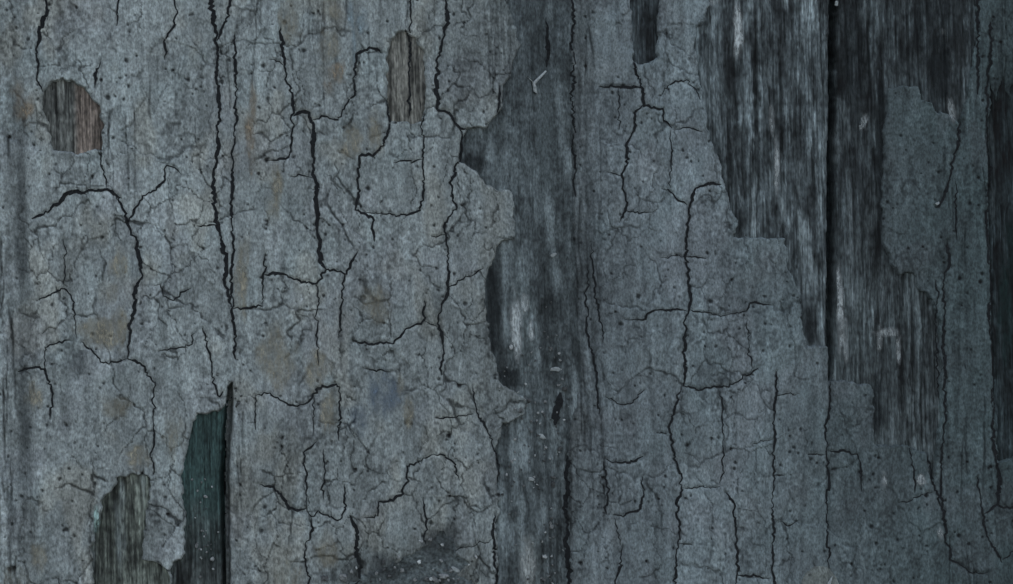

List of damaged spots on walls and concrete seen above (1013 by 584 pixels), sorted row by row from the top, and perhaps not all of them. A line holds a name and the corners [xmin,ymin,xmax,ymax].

peeling [43,79,104,155]
peeling [386,32,426,124]
peeling [630,0,659,64]
crack [18,0,483,584]
peeling [458,0,582,584]
crack [545,0,799,584]
peeling [694,0,976,479]
peeling [987,78,1013,461]
peeling [91,400,229,584]
crack [436,387,500,480]
crack [457,515,498,584]
crack [808,382,863,569]